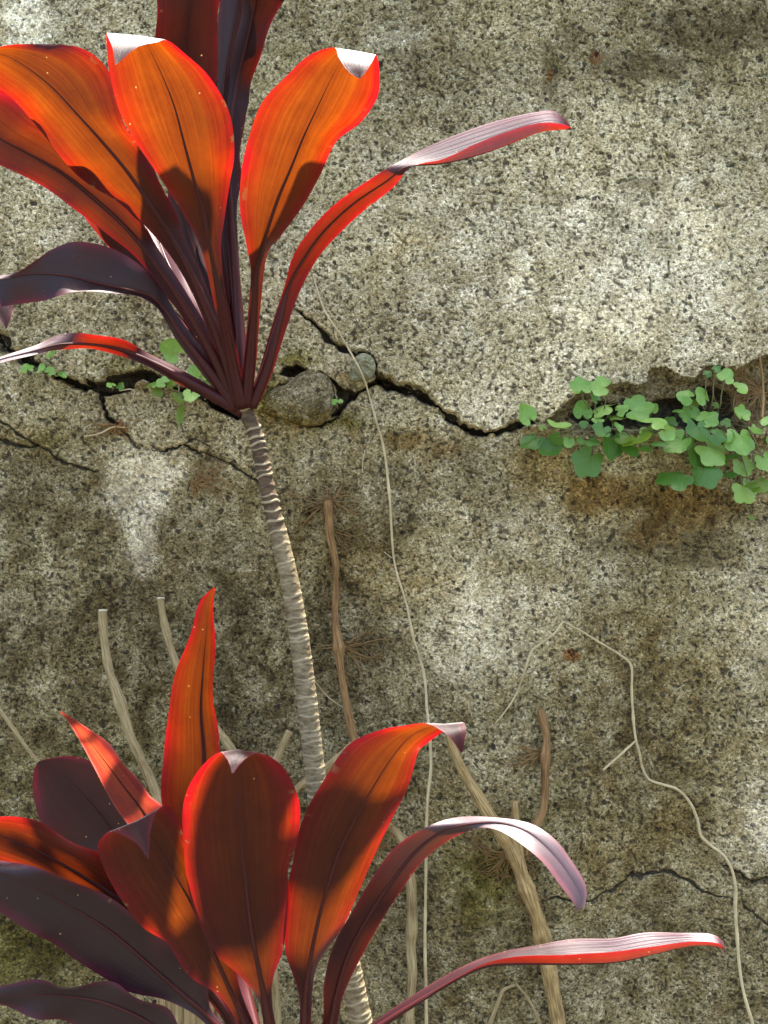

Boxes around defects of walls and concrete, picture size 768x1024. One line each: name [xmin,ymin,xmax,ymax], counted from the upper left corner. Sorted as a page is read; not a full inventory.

crack [0,334,258,481]
crack [295,309,537,436]
water stain [568,473,734,569]
crack [542,863,768,926]